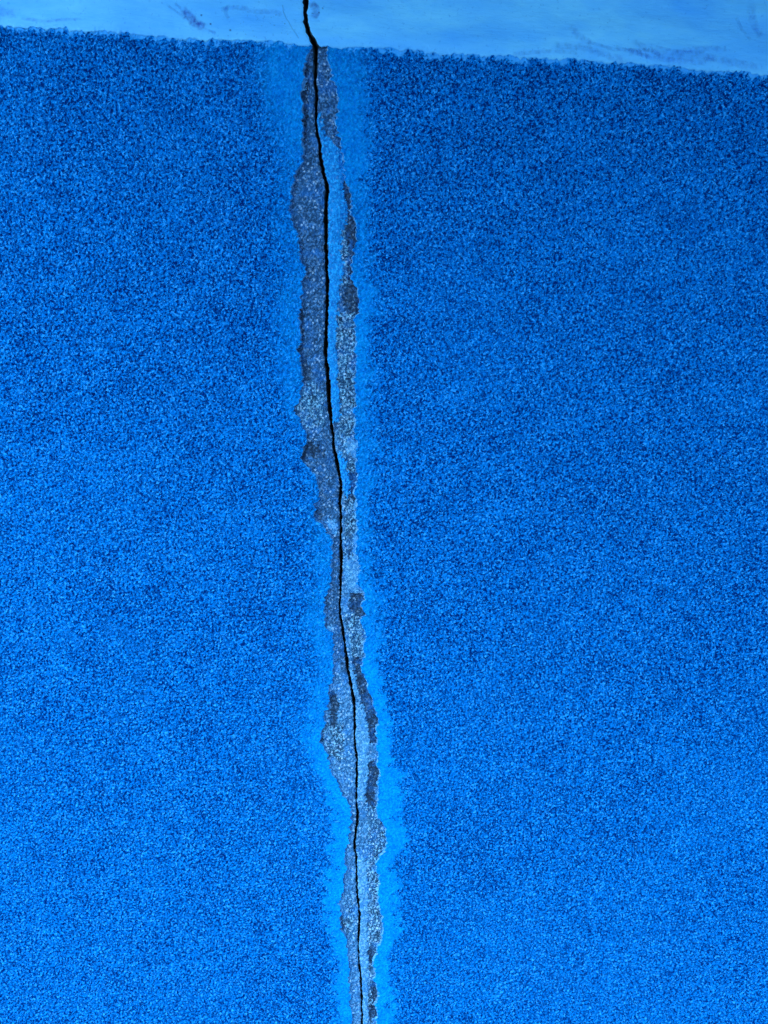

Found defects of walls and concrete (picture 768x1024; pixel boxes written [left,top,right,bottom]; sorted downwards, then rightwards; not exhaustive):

crack [302,0,364,1024]
spalling [288,46,388,1024]